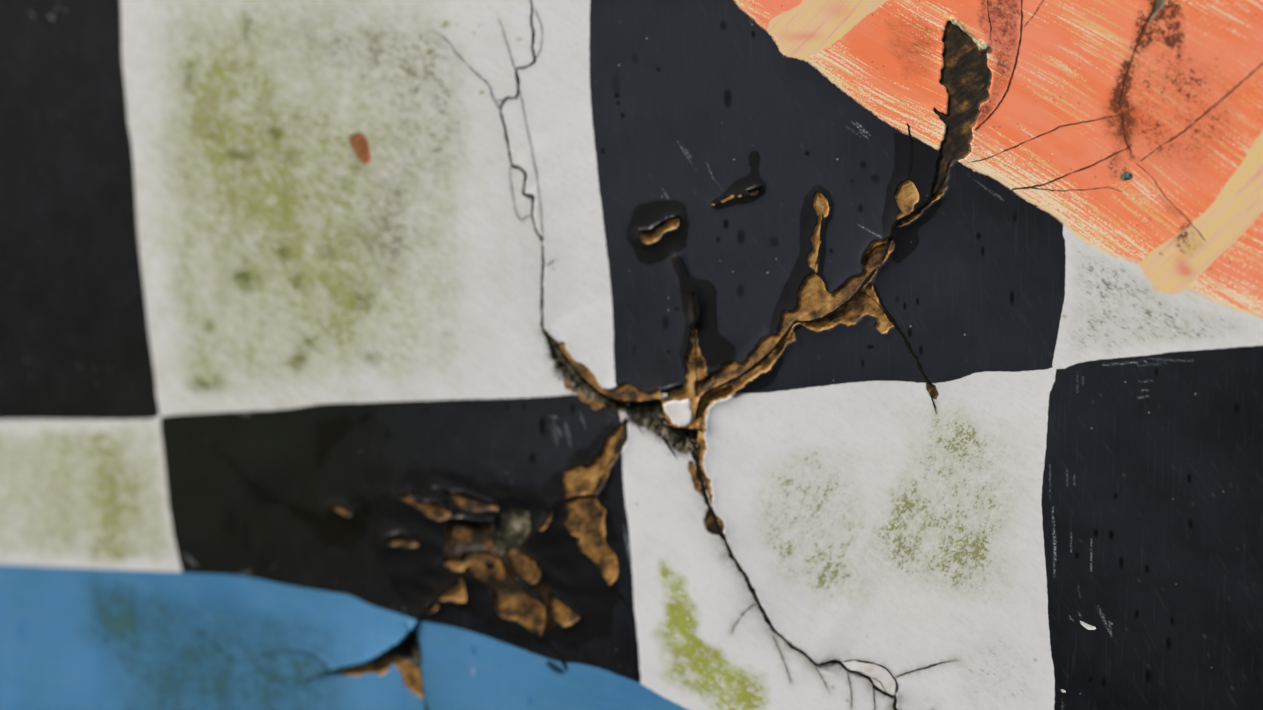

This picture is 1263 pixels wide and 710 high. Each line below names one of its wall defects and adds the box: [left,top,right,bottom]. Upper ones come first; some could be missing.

peeling [398,18,992,635]
crack [433,0,1263,710]
peeling [387,535,419,547]
crack [260,570,461,710]
peeling [341,631,423,698]